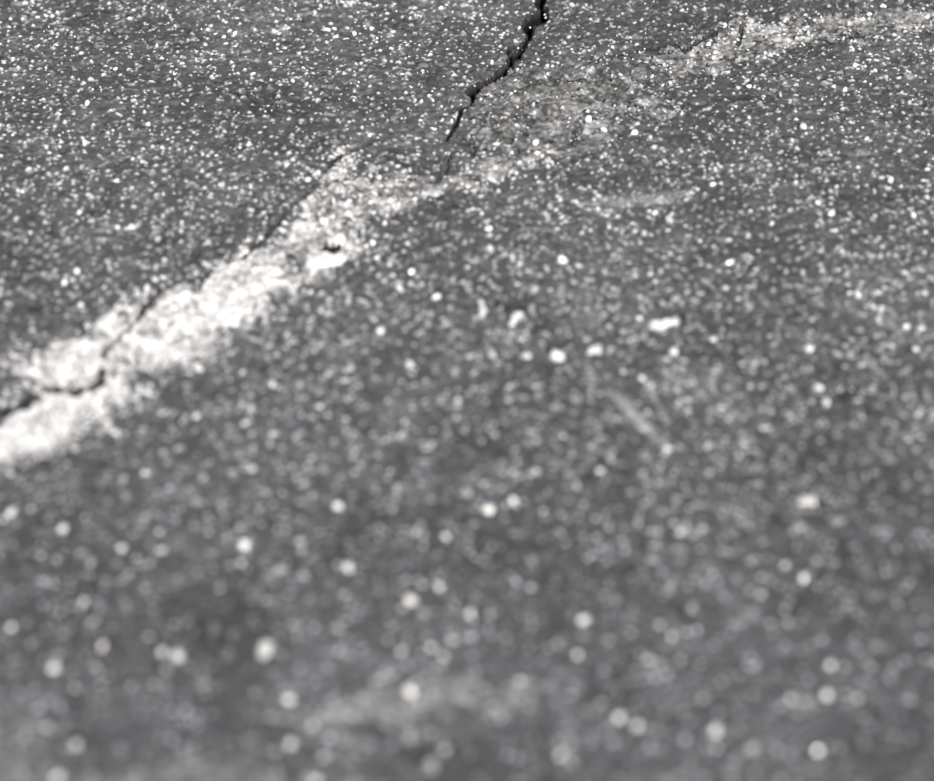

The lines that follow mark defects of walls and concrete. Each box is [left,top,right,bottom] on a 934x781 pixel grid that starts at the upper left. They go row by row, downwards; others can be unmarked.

crack [227,91,275,106]
crack [437,0,550,184]
crack [0,143,372,421]